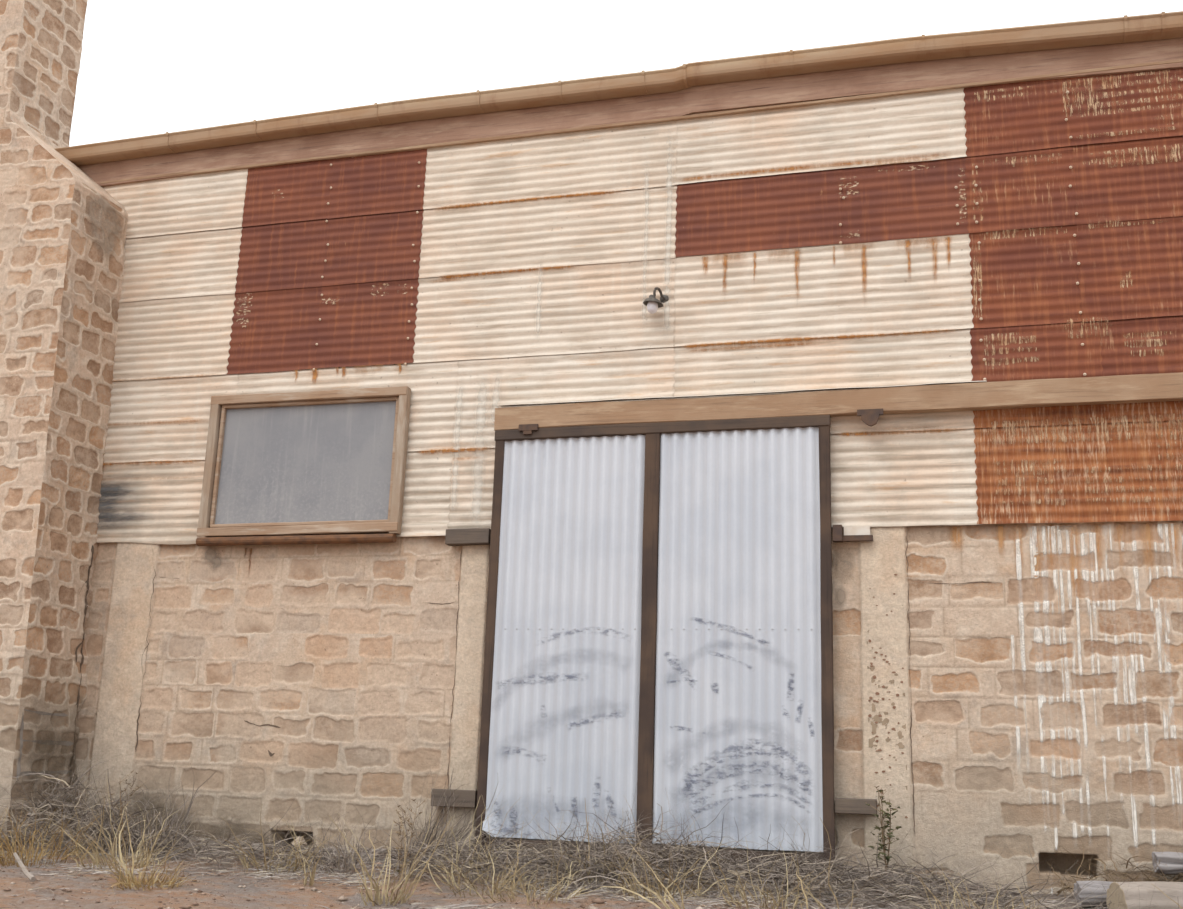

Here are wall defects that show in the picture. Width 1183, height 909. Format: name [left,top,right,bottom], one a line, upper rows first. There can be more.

rust [686,166,810,180]
water stain [98,485,133,521]
water stain [1154,523,1183,552]
water stain [1011,525,1171,745]
water stain [1163,698,1176,739]
water stain [1117,723,1151,771]
water stain [1041,756,1089,805]
water stain [1170,766,1182,804]
water stain [1042,790,1092,838]